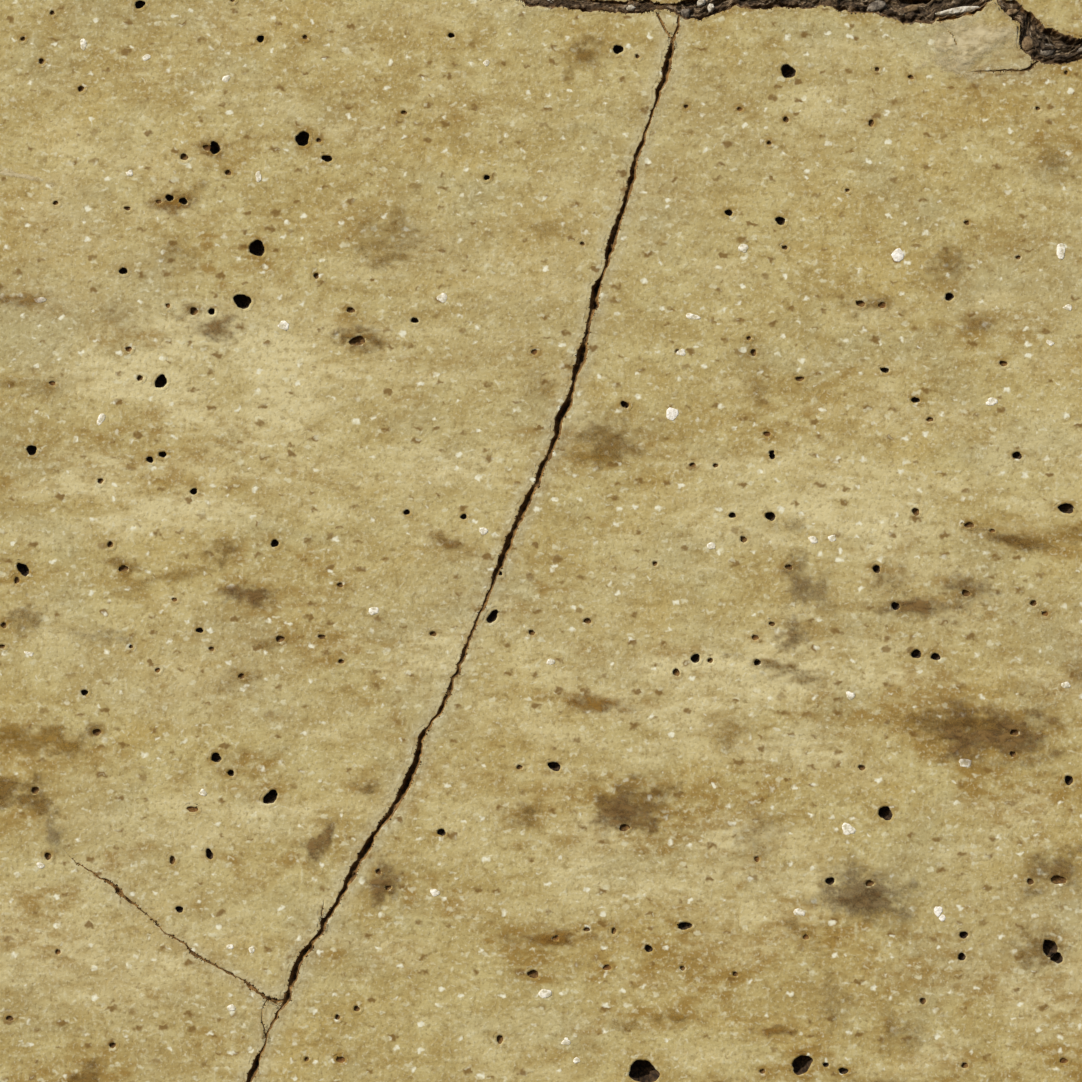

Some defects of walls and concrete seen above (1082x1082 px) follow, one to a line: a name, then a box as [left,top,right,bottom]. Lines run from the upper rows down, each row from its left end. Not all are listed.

crack [60,10,683,1082]
crack [475,0,1082,76]